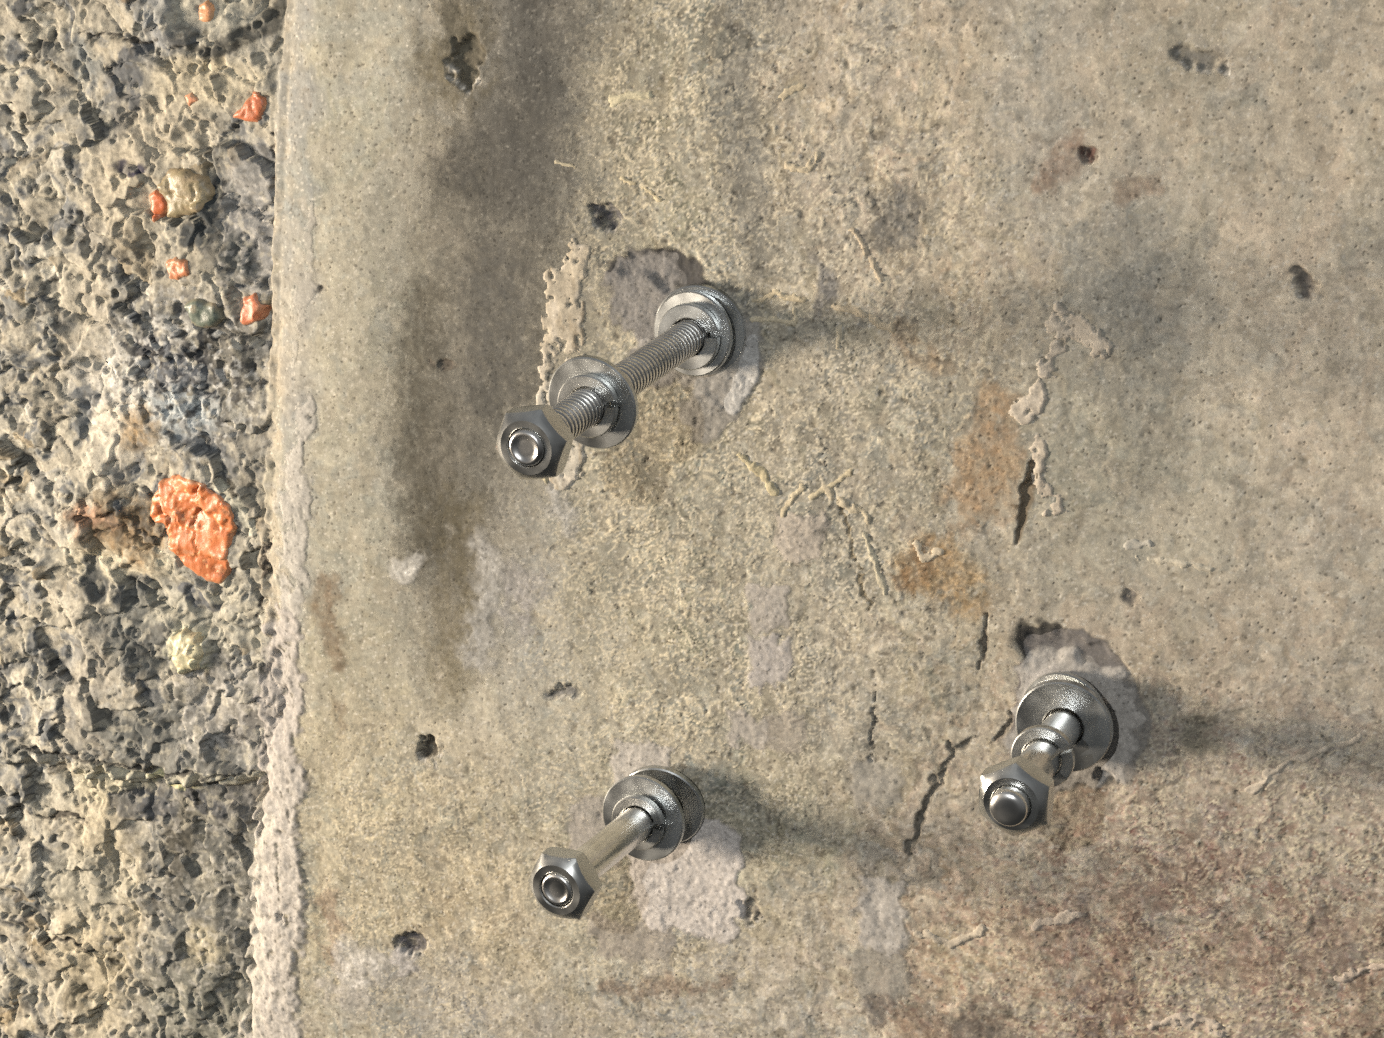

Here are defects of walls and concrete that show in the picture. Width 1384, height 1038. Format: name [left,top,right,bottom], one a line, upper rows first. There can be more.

leakage [390,95,556,693]
crack [978,612,988,669]
crack [905,710,1013,855]